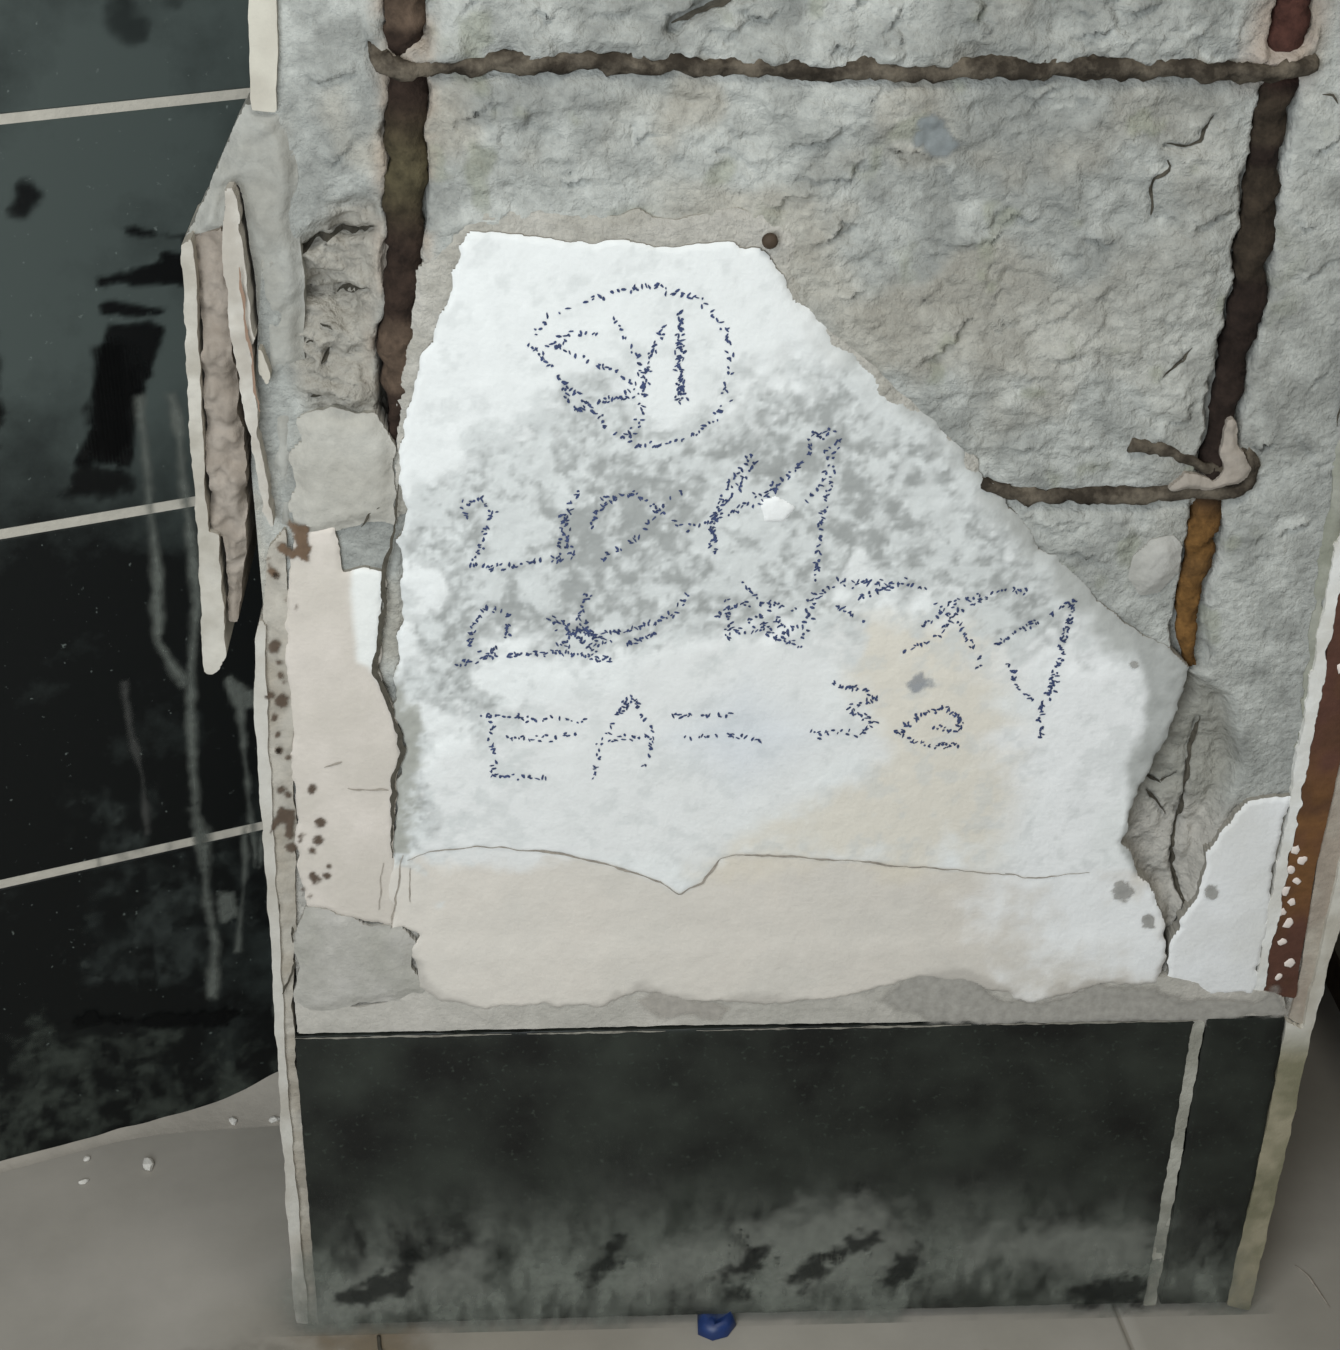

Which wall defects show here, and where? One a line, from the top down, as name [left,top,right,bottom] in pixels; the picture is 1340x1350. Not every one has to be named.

crack [671,0,731,23]
peeling [186,0,1340,1009]
crack [1146,716,1200,921]
water stain [302,1235,664,1332]
water stain [691,1232,995,1322]
water stain [1052,1232,1219,1308]